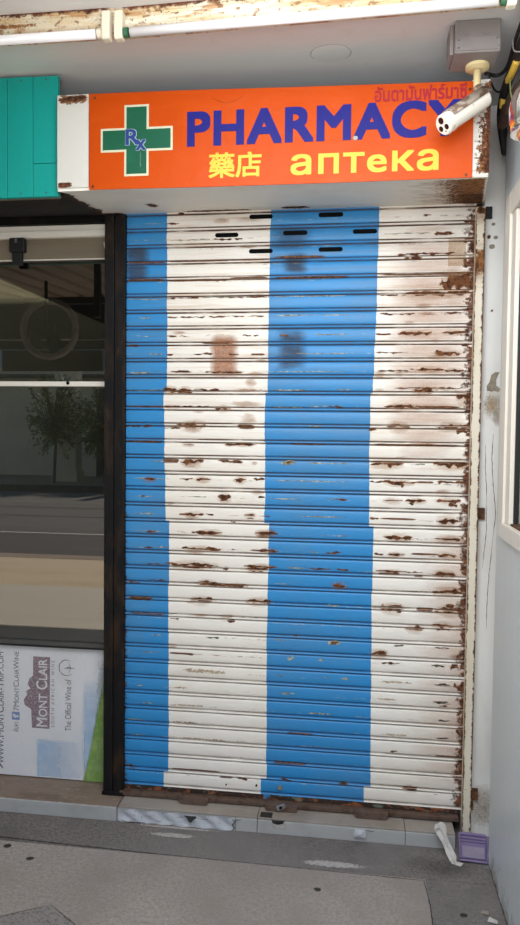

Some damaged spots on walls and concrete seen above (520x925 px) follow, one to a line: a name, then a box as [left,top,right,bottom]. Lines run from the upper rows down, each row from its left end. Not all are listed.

corrosion [194,334,258,374]
corrosion [169,421,205,429]
corrosion [163,458,203,466]
corrosion [370,204,486,832]
corrosion [148,562,228,570]
corrosion [198,580,245,588]